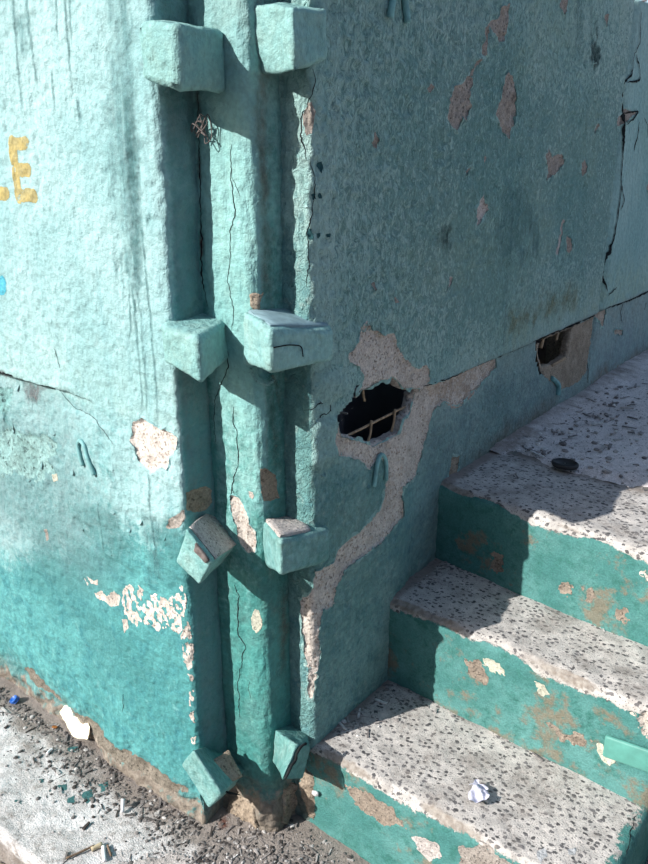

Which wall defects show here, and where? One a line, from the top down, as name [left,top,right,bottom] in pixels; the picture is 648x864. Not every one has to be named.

crack [197,94,207,303]
crack [227,144,239,324]
crack [425,13,648,386]
crack [41,385,112,442]
spalling [129,415,178,476]
spalling [151,468,280,559]
crack [213,354,239,504]
spalling [266,516,311,538]
spalling [298,322,498,702]
peeling [84,577,195,723]
crack [234,585,250,717]
peeling [345,784,442,862]